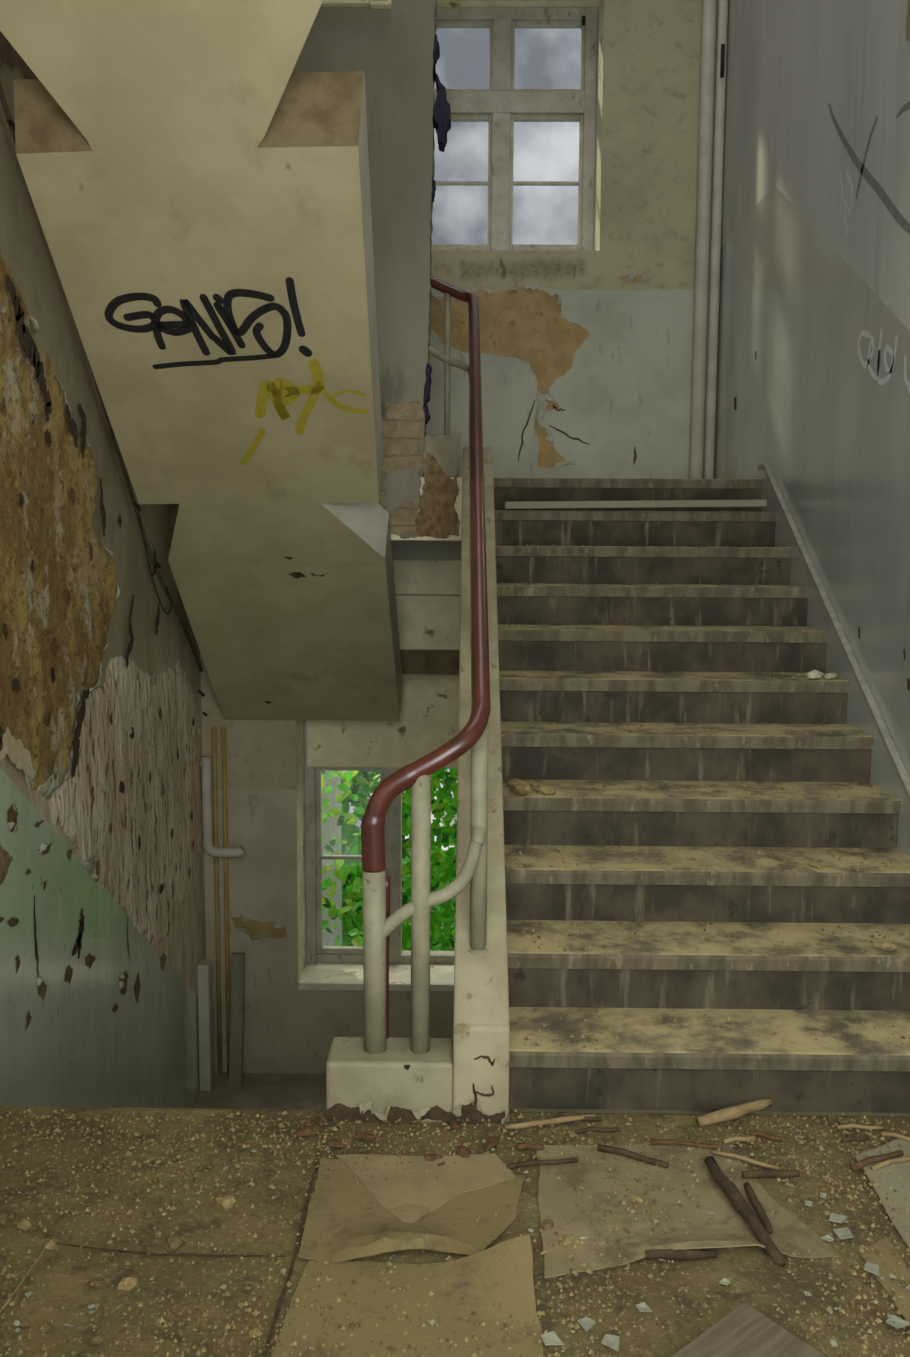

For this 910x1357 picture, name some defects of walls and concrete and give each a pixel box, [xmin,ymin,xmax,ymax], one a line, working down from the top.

spalling [378,364,460,539]
peeling [430,284,590,468]
spalling [0,255,203,972]
spalling [37,975,49,1001]
spalling [65,953,96,983]
spalling [112,970,141,1012]